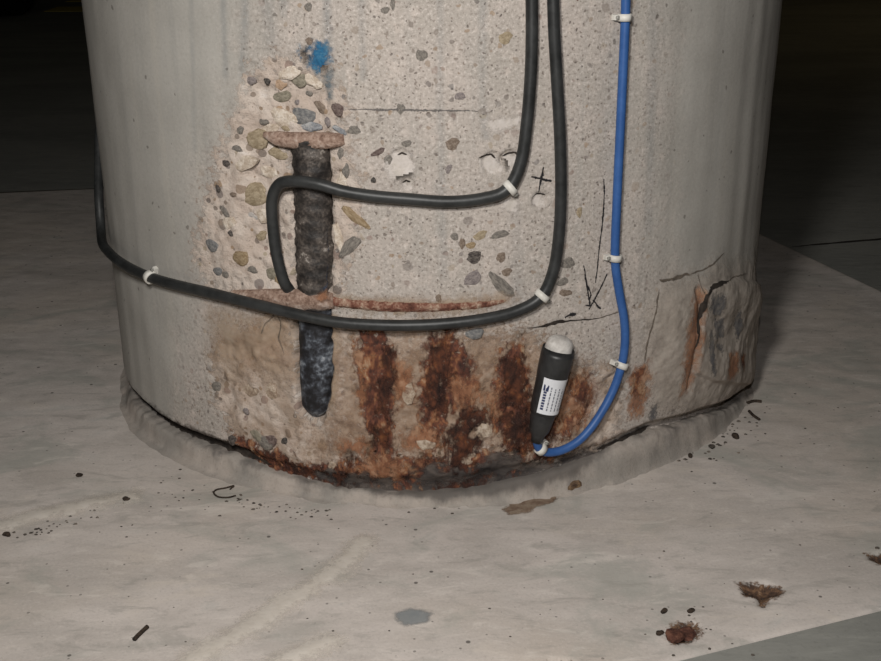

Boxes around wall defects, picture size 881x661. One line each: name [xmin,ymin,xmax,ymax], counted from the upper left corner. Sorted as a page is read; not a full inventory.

spalling [188,37,631,481]
crack [644,253,747,364]
corrosion [234,327,593,490]
corrosion [628,364,652,418]